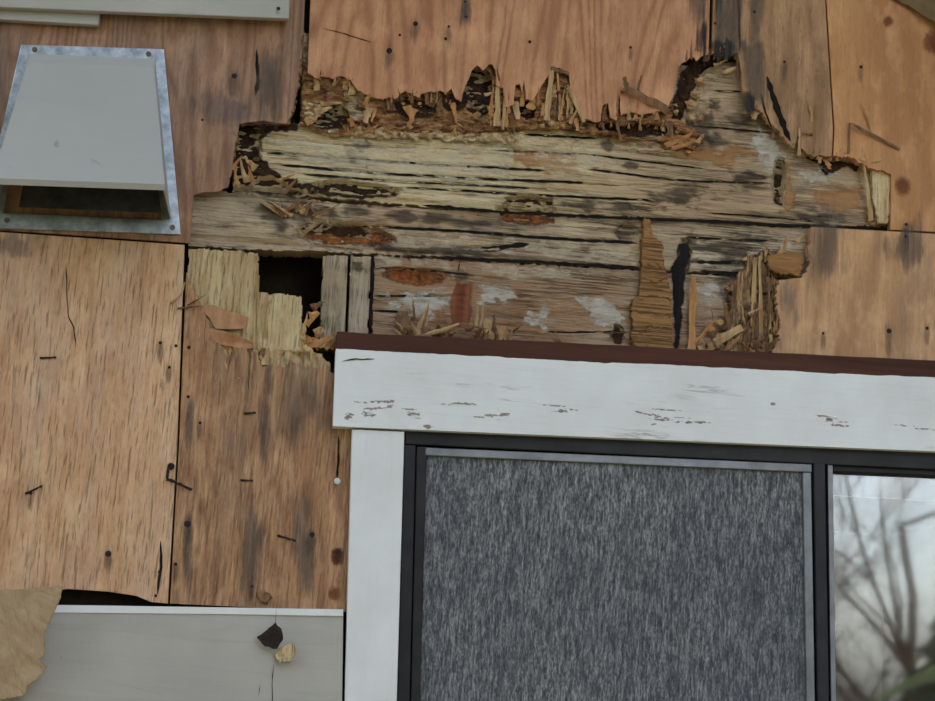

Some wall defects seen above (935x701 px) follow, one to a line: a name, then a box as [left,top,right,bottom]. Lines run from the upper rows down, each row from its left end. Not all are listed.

peeling [313,66,457,128]
peeling [501,85,589,131]
peeling [818,149,852,169]
crack [66,270,76,344]
peeling [345,400,431,429]
peeling [635,408,706,427]